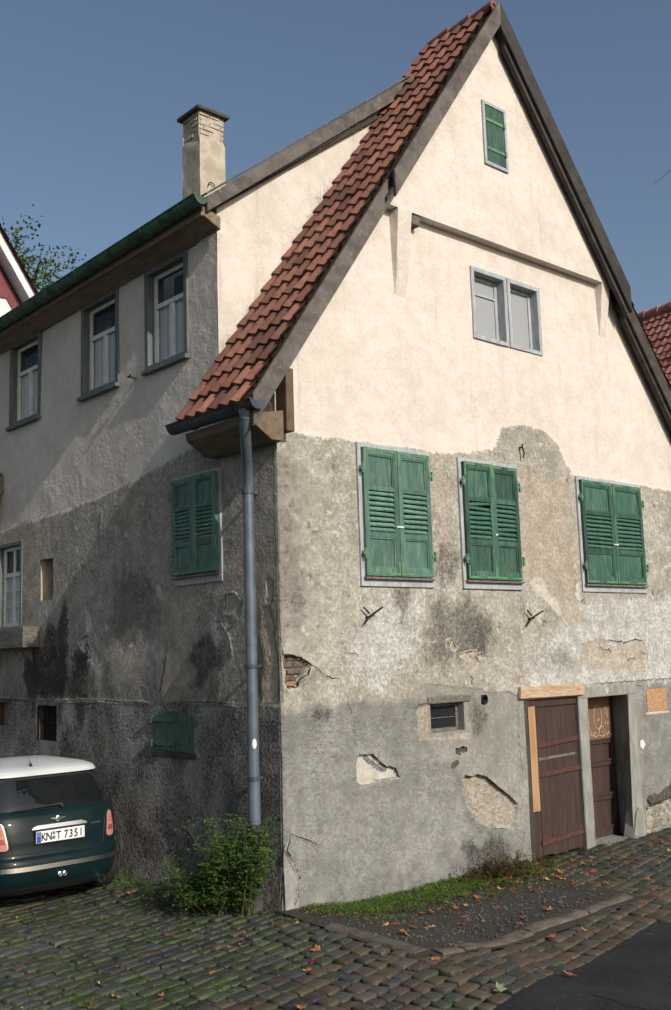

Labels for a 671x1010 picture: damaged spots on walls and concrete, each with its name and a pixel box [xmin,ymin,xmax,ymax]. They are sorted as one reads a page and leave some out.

damp [21,600,116,730]
flaking render [259,579,331,702]
flaking render [444,637,485,687]
spalling [351,747,402,785]
spalling [451,742,519,835]